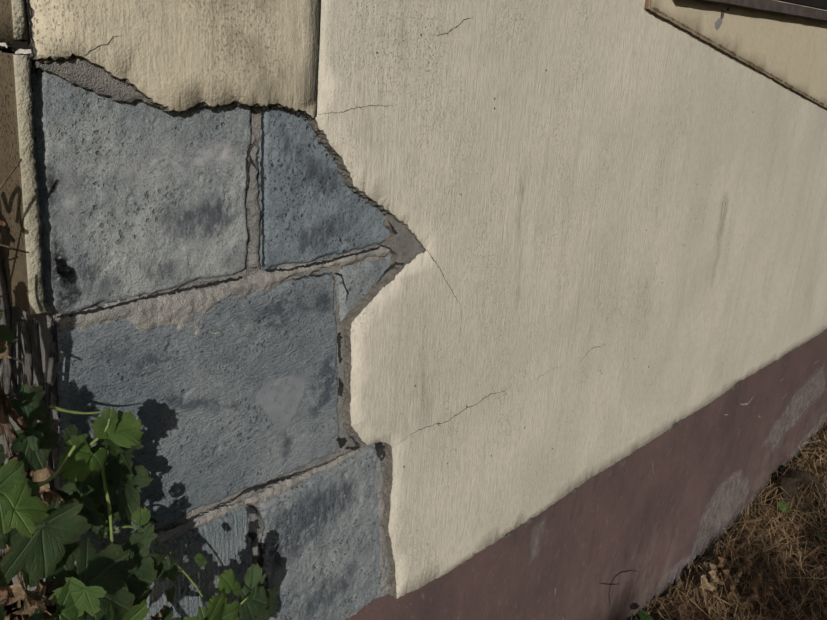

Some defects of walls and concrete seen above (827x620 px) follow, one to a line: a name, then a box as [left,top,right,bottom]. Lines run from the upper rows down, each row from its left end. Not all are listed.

crack [244,110,380,304]
crack [57,276,242,318]
crack [377,261,404,282]
flaking render [30,54,424,620]
crack [402,387,504,441]